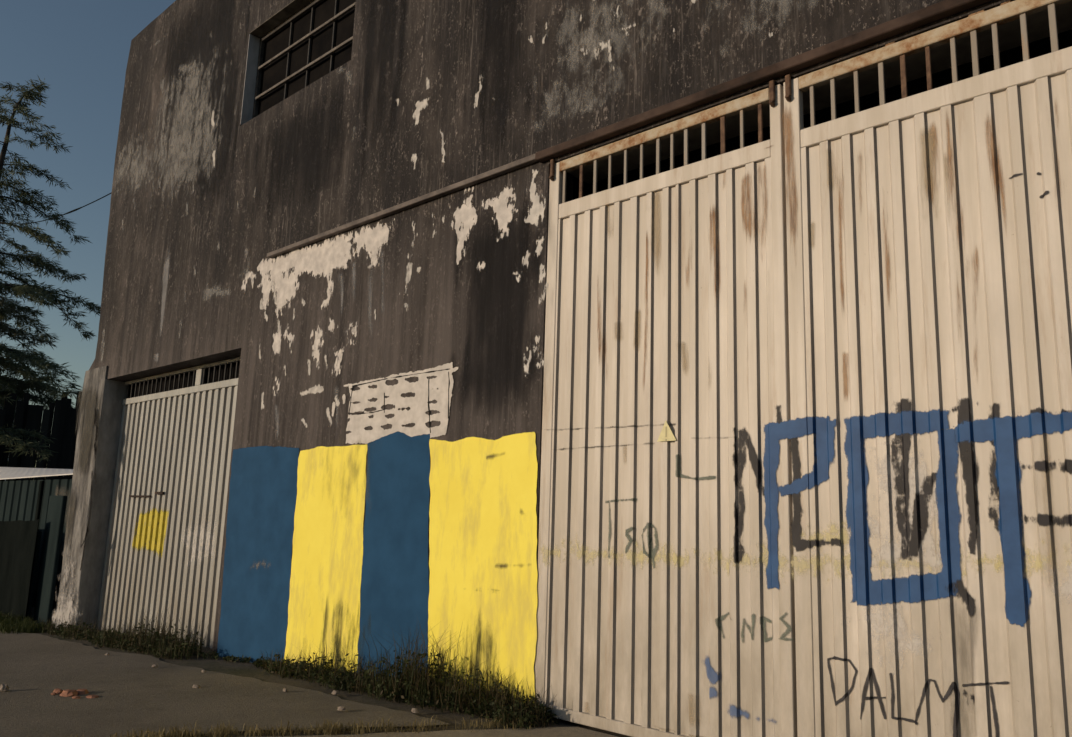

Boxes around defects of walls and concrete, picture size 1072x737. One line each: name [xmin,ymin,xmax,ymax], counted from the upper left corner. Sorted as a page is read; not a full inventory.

water stain [115,0,238,201]
peeling [413,77,430,125]
rust [923,123,953,200]
rust [986,121,1005,207]
water stain [161,258,169,331]
peeling [203,218,395,424]
peeling [397,222,421,311]
peeling [432,170,548,304]
peeling [524,336,544,377]
rust [710,210,720,292]
rust [742,176,764,237]
water stain [55,487,75,548]